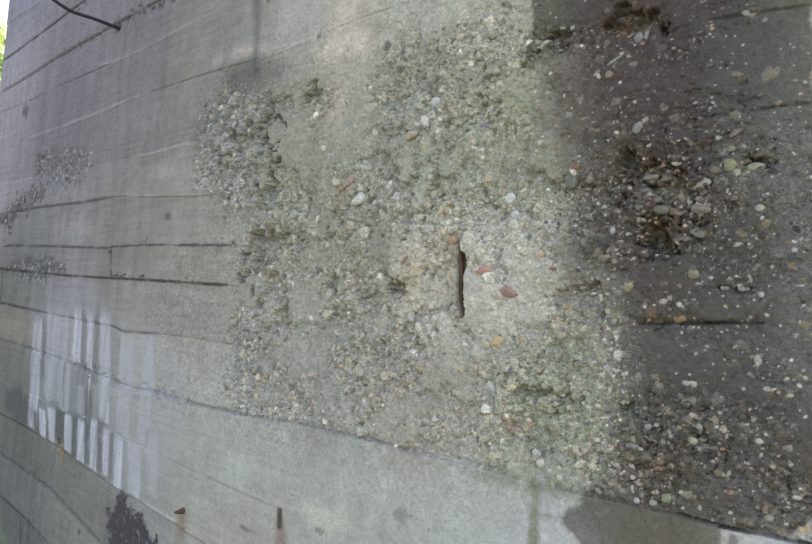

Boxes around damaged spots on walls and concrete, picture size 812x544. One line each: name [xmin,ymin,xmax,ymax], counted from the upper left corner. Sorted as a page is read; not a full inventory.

hole [601,5,669,37]
hole [304,82,324,108]
spalling [214,103,284,211]
hole [742,156,777,169]
hole [616,147,701,261]
spalling [240,225,291,326]
hole [388,280,408,300]
hole [552,279,607,319]
spalling [516,382,587,407]